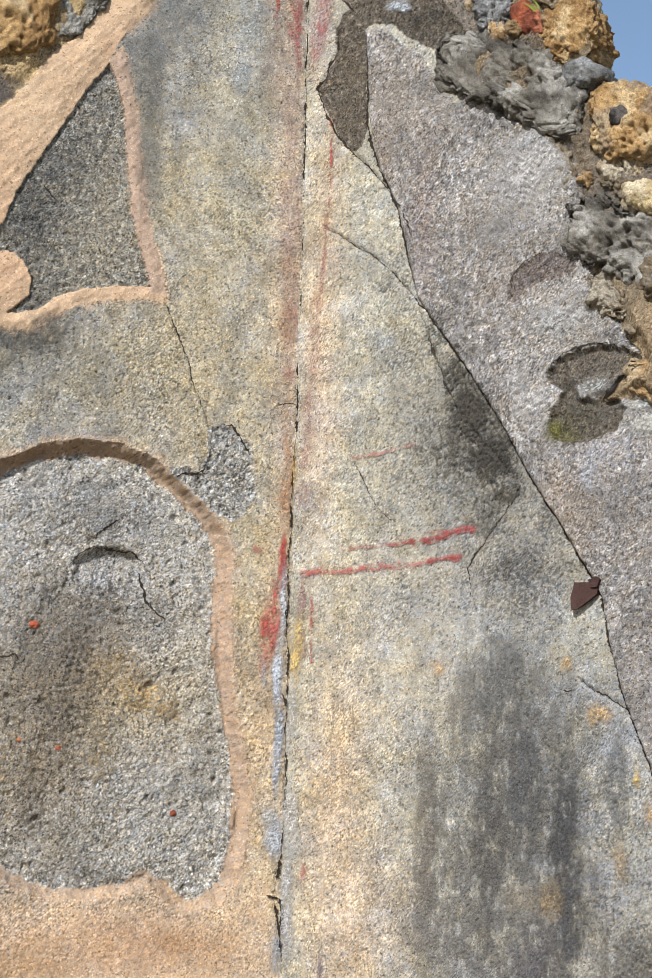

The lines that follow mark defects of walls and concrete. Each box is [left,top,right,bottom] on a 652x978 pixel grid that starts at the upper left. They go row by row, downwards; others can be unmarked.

flaking render [0,53,151,313]
flaking render [319,0,467,151]
crack [300,0,652,776]
flaking render [506,249,577,302]
crack [67,520,165,619]
flaking render [0,423,256,915]
crack [267,363,299,966]
leakage [415,648,594,978]